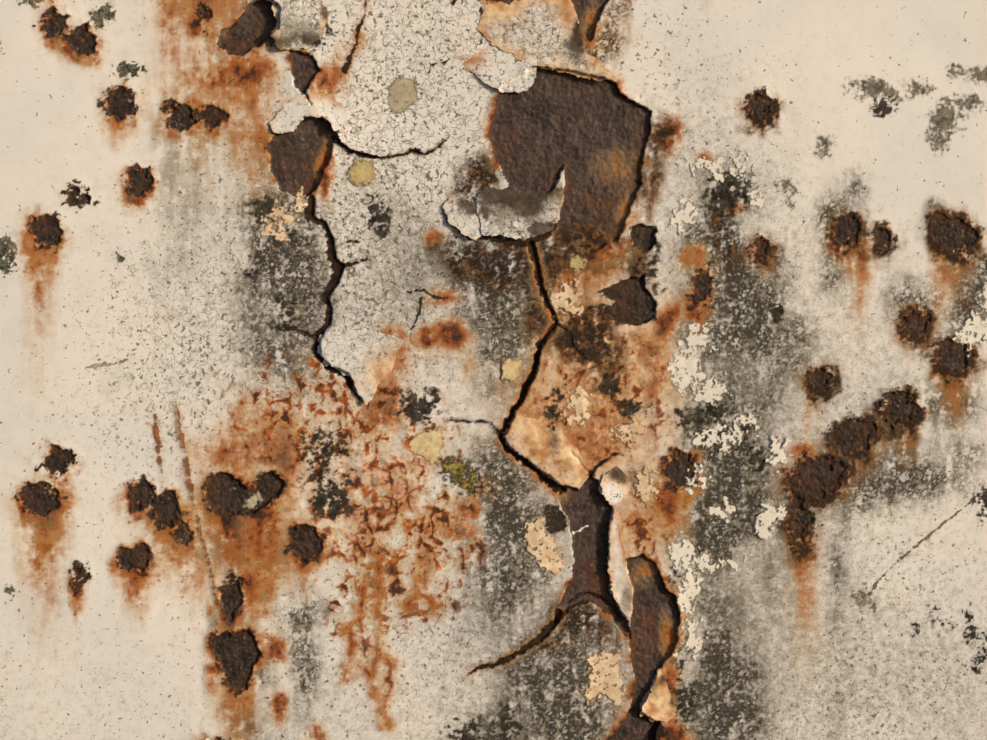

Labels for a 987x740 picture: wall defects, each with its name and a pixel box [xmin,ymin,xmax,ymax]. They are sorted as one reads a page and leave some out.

corrosion [15,444,77,570]
peeling [217,0,348,247]
water stain [235,187,333,382]
corrosion [109,319,486,740]
crack [283,196,369,399]
crack [445,216,586,495]
crack [469,592,621,674]
peeling [443,0,699,326]
peeling [542,475,754,740]
mould [669,169,811,740]
corrosion [780,385,927,627]
mould [843,76,983,151]